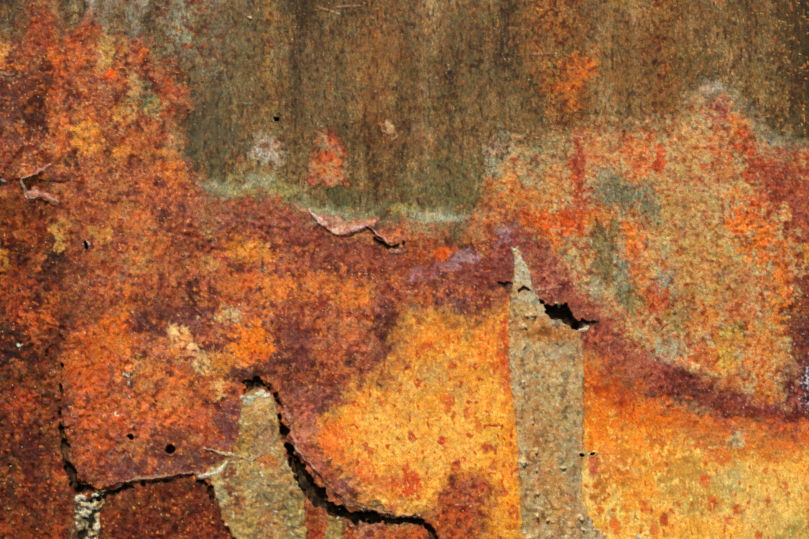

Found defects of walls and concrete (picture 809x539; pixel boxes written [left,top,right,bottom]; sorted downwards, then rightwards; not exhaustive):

corrosion [0,0,213,206]
corrosion [304,124,358,190]
peeling [307,208,406,253]
corrosion [469,0,809,401]
corrosion [0,191,97,539]
peeling [74,491,105,539]
crack [58,363,214,502]
peeling [195,388,308,539]
peeling [324,515,343,539]
crack [242,376,438,539]
corrosion [42,143,809,539]
peeling [508,247,607,539]